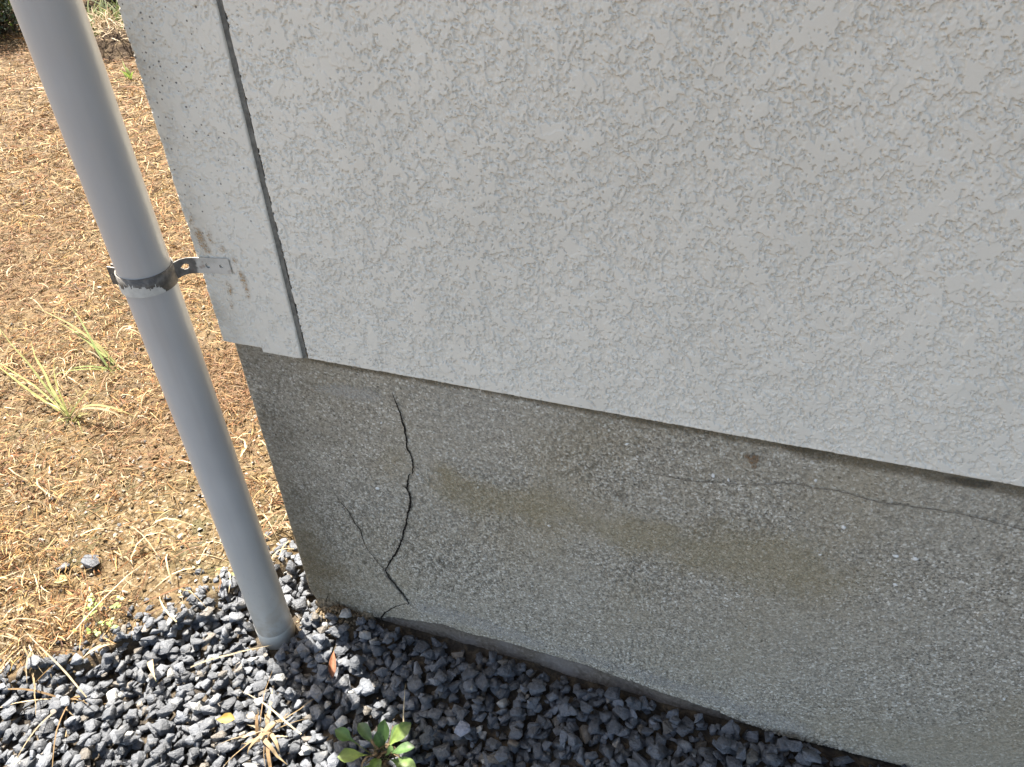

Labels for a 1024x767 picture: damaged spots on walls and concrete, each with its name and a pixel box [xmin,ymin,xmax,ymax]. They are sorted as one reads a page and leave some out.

crack [335,393,420,621]
crack [771,483,1023,530]